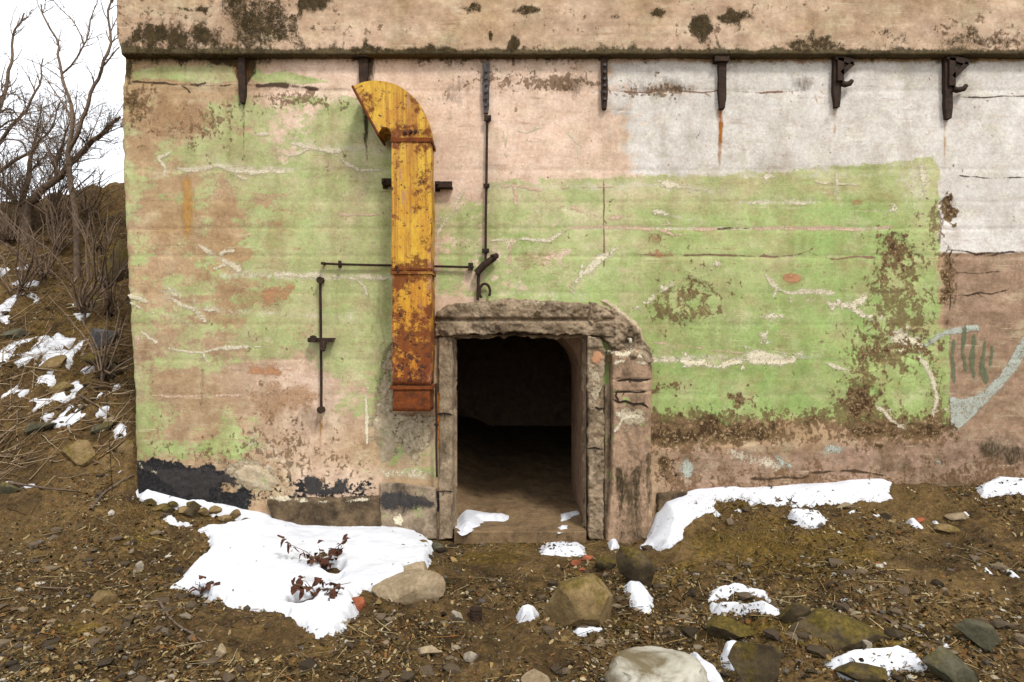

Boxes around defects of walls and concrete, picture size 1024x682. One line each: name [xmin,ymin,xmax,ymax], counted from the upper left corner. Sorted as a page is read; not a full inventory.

leakage [124,0,331,82]
spalling [941,192,959,227]
peeling [635,277,706,310]
spalling [823,231,960,454]
crack [587,338,743,453]